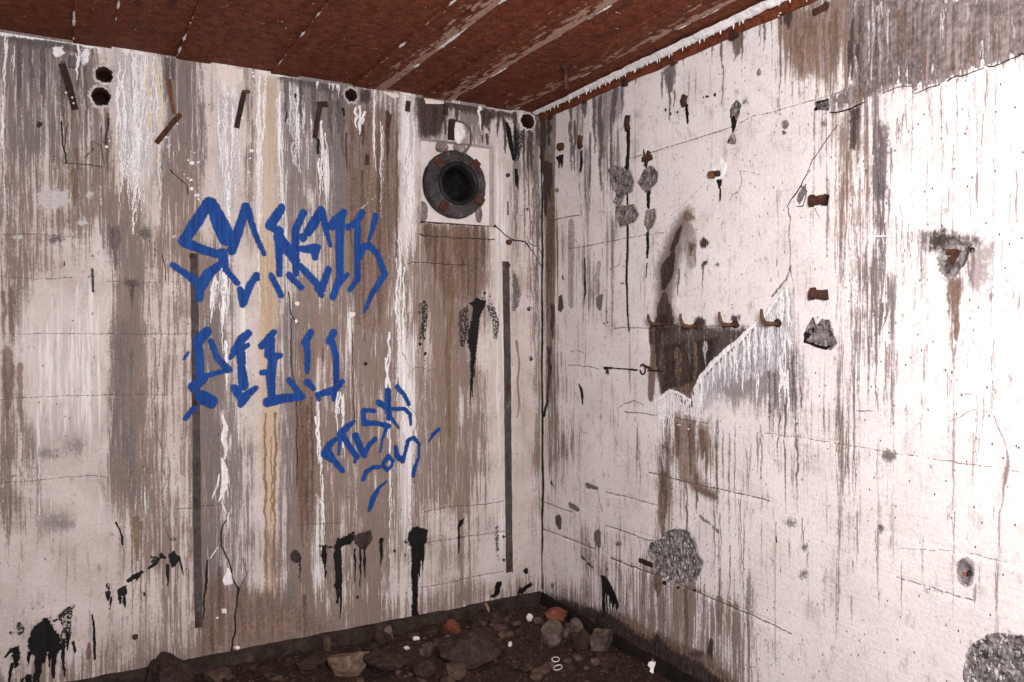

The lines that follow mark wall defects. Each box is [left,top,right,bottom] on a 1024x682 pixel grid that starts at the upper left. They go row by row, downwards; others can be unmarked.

spalling [608,165,658,231]
crack [772,125,838,297]
water stain [256,0,804,607]
spalling [803,317,837,350]
water stain [830,0,1024,567]
spalling [936,237,973,280]
crack [0,330,247,652]
spalling [648,528,703,591]
spalling [963,633,1024,682]